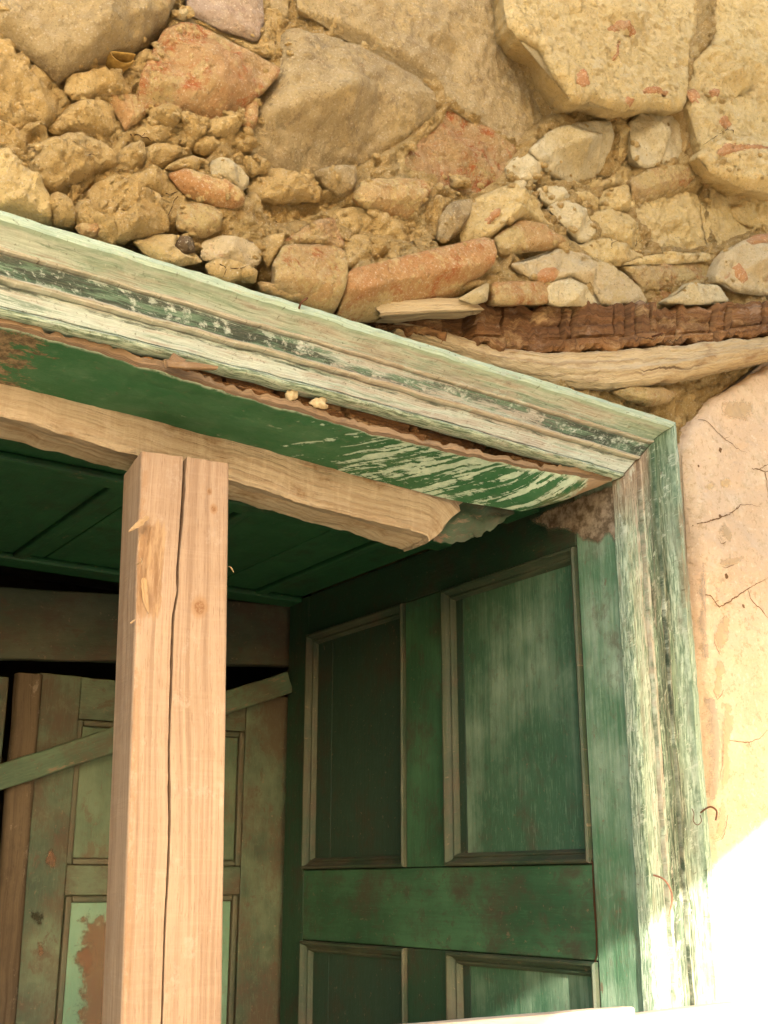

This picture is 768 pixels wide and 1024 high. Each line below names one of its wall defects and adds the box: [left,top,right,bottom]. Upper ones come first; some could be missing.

crack [692,420,768,526]
crack [697,579,768,618]
peeling [75,915,106,1024]